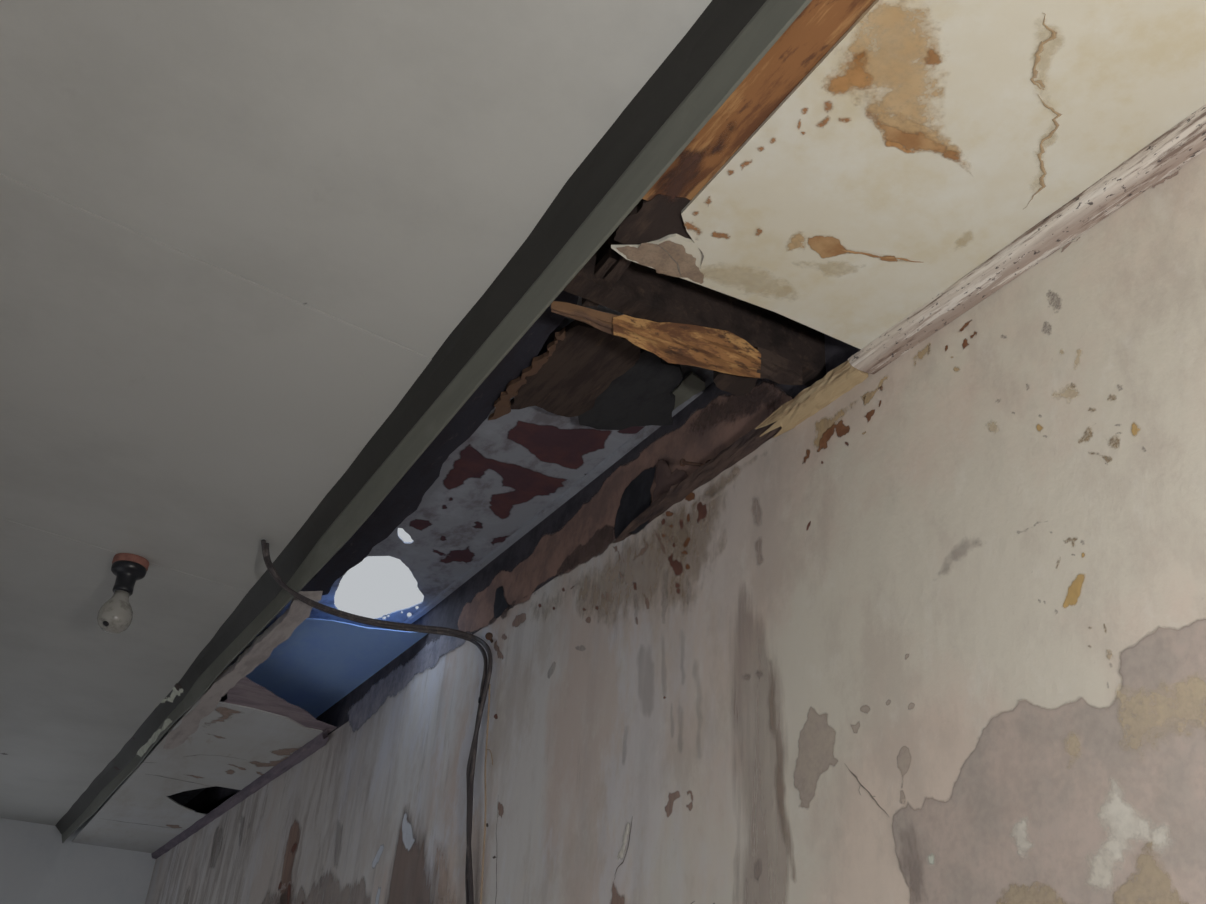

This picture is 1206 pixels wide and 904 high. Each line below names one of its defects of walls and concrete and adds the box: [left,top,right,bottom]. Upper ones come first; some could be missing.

water stain [828,4,960,162]
water stain [788,234,916,262]
flaking render [824,334,861,374]
flaking render [316,378,808,735]
water stain [494,613,526,659]
flaking render [184,786,241,811]
water stain [777,756,785,836]
peeling [794,708,838,808]
peeling [892,619,1206,904]
water stain [387,813,454,904]